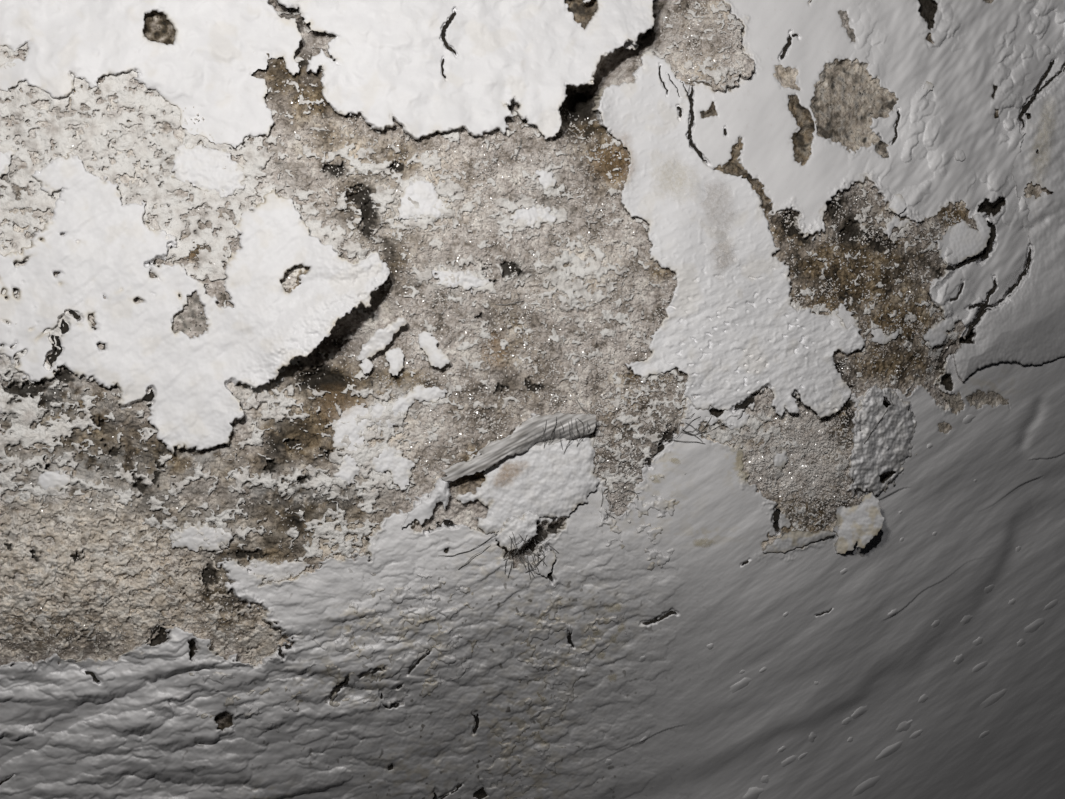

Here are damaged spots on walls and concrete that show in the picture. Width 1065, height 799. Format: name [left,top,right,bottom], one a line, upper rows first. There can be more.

crack [1018,59,1065,130]
spalling [0,0,1009,666]
peeling [309,574,479,715]
peeling [474,550,624,799]